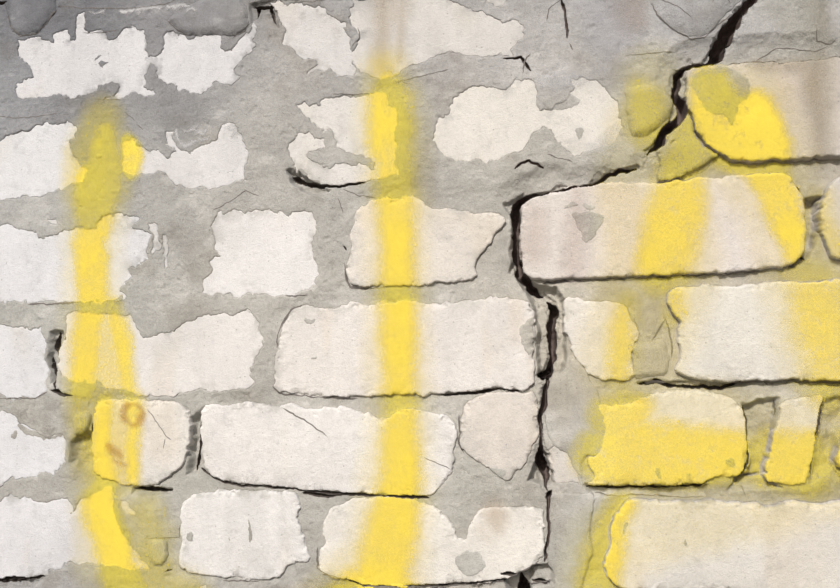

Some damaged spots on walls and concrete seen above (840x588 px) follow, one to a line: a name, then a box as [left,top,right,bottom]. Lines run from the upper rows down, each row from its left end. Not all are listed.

peeling [16,12,257,100]
crack [503,53,531,74]
crack [756,25,839,61]
peeling [133,123,249,190]
peeling [288,95,383,185]
peeling [432,78,622,164]
crack [510,0,757,562]
crack [518,572,531,588]